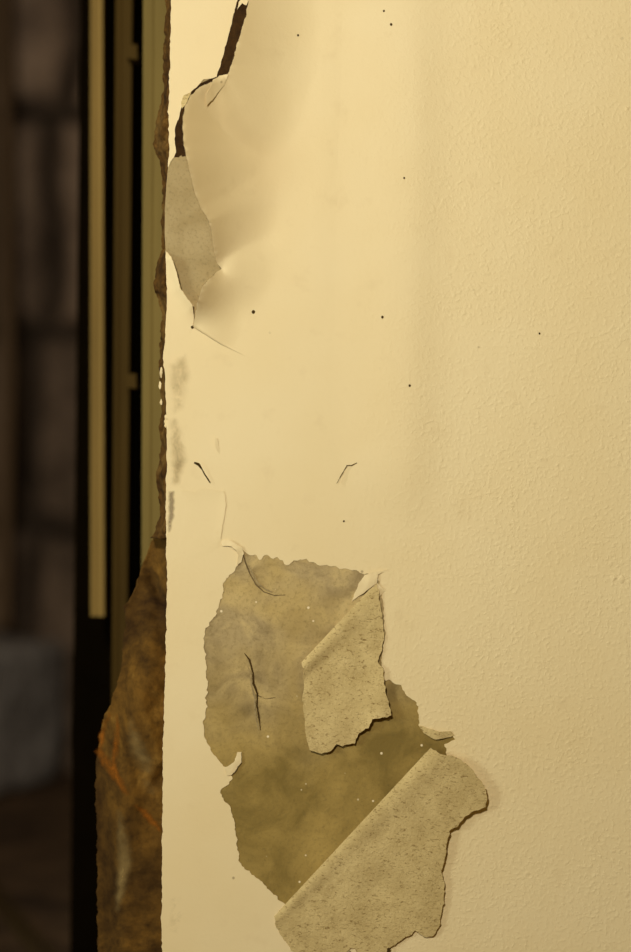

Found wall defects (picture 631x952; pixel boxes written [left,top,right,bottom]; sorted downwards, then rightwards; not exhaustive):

peeling [94,0,343,952]
crack [244,653,276,730]
peeling [203,539,487,952]